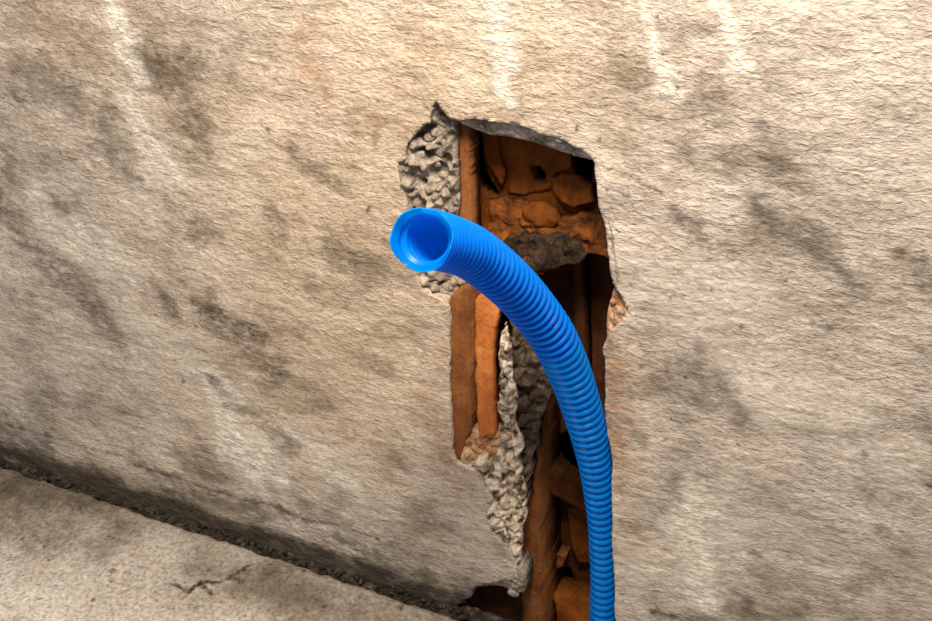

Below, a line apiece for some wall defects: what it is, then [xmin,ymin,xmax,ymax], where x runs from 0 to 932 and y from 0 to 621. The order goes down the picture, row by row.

flaking render [399,105,597,216]
flaking render [416,270,467,296]
flaking render [606,219,631,337]
flaking render [461,322,534,597]
crack [0,458,512,621]